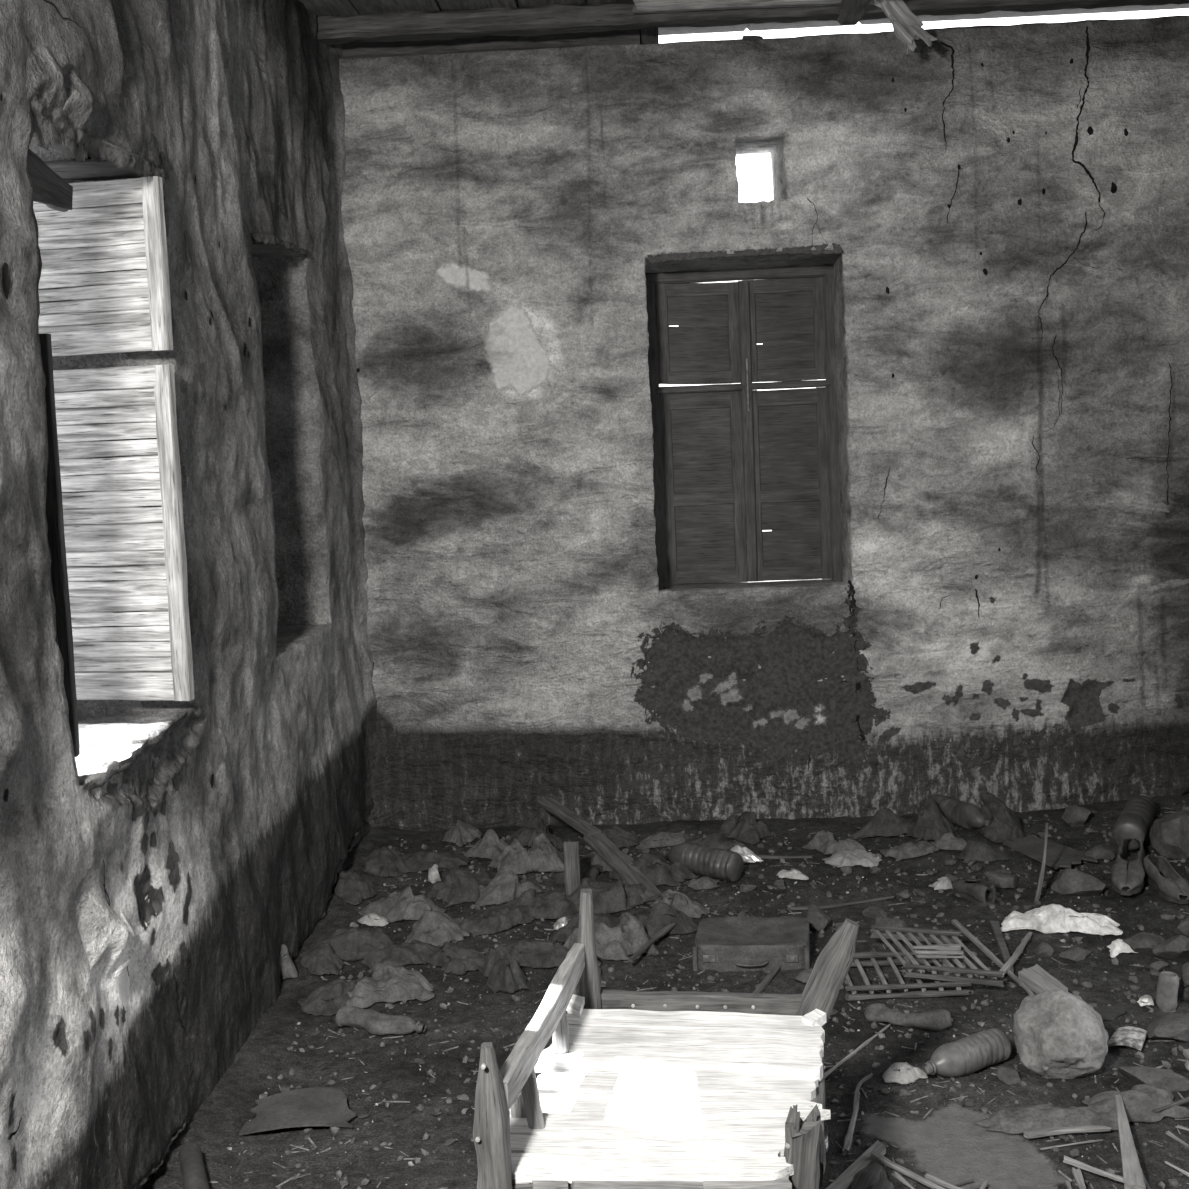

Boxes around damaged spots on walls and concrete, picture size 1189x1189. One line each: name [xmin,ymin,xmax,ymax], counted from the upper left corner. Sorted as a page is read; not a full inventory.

crack [940,41,959,223]
crack [1032,26,1105,474]
flaking render [630,584,901,770]
flaking render [902,673,1135,760]
flaking render [89,707,208,946]
flaking render [53,1016,67,1056]
flaking render [84,1005,131,1062]
flaking render [152,941,188,985]